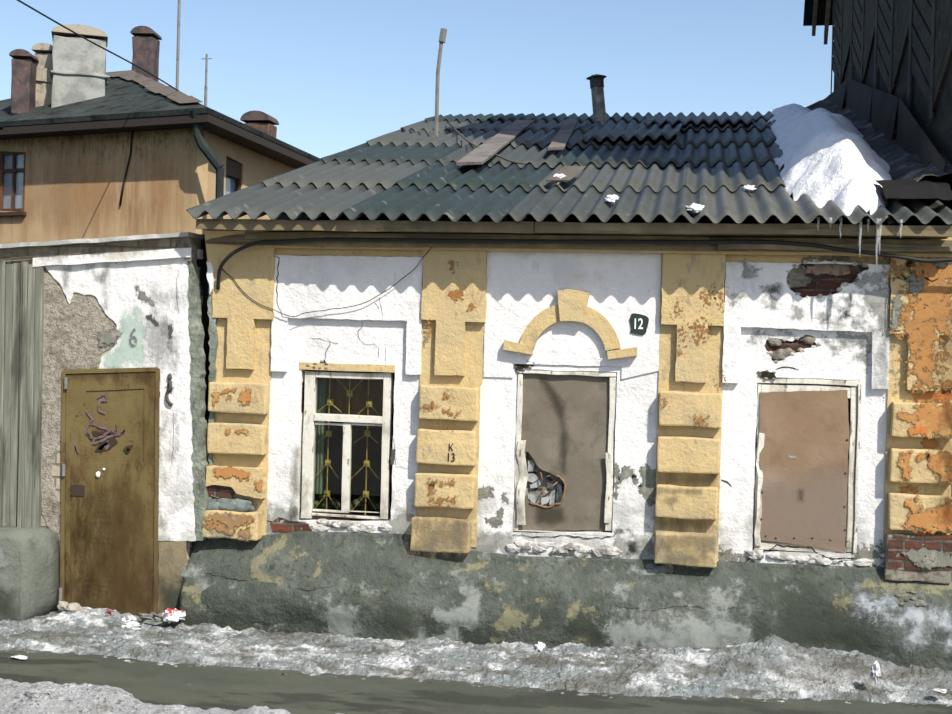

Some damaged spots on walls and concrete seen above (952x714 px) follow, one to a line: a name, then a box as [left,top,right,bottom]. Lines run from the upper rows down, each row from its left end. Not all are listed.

spalling [786,255,868,299]
peeling [135,286,174,344]
spalling [757,335,821,380]
peeling [832,257,952,611]
peeling [207,466,263,499]
peeling [613,462,656,507]
leakage [473,532,524,555]
leakage [613,526,655,559]
efflorescence [181,565,210,592]
leakage [459,626,485,645]
leakage [575,614,607,648]
leakage [762,587,952,655]